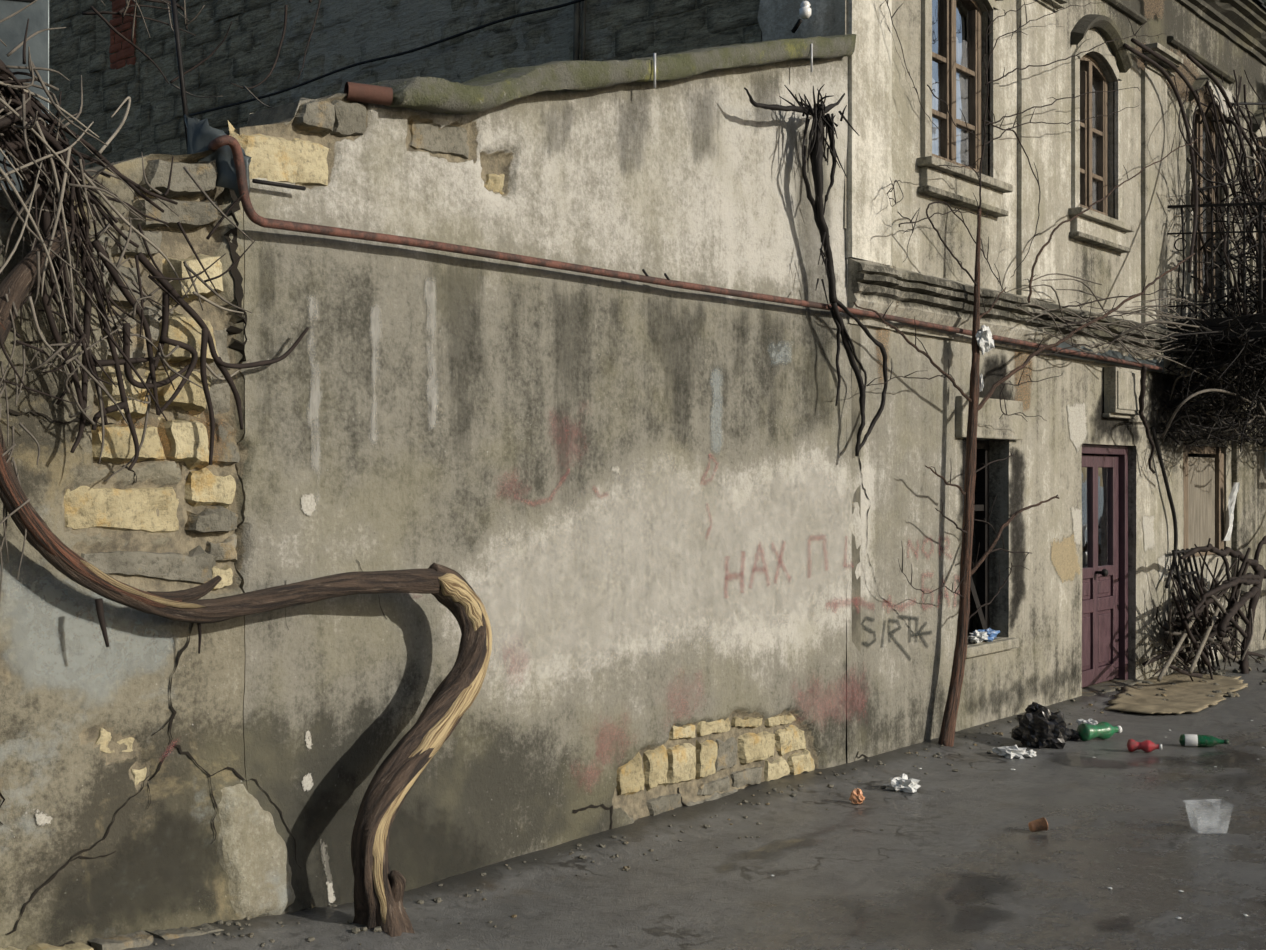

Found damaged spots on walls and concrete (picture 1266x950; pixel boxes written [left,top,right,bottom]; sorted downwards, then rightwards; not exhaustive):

flaking render [228,98,367,186]
flaking render [409,119,469,159]
flaking render [484,173,505,194]
leakage [308,340,321,469]
leakage [371,307,380,382]
leakage [425,281,436,428]
leakage [994,439,1026,627]
crack [7,623,301,935]
flaking render [616,713,815,816]